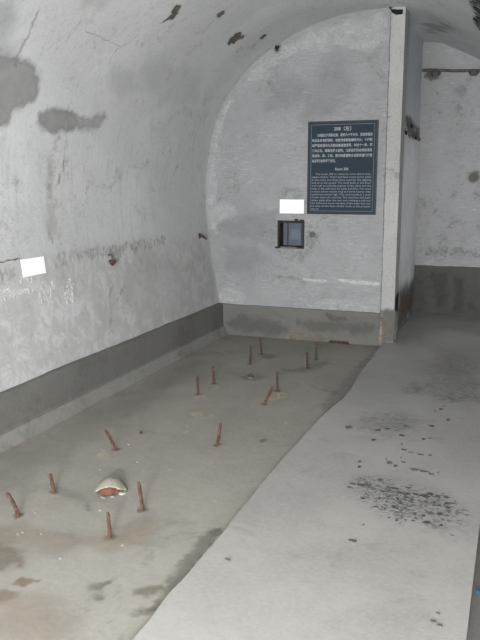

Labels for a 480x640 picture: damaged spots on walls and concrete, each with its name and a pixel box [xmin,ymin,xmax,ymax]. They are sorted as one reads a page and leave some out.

water stain [0,57,38,126]
water stain [39,109,105,133]